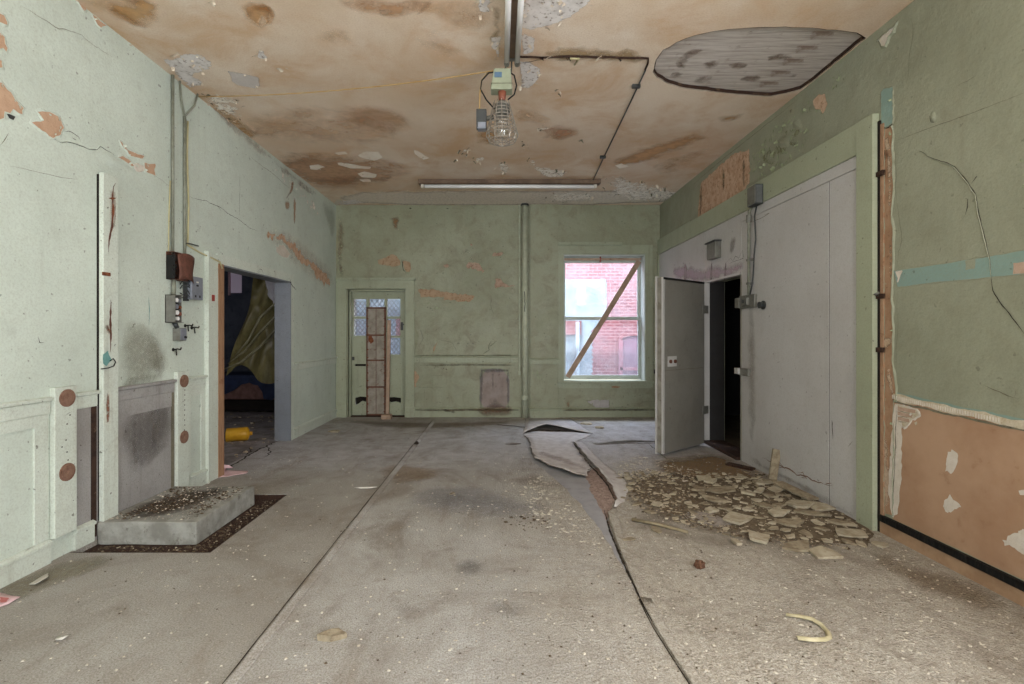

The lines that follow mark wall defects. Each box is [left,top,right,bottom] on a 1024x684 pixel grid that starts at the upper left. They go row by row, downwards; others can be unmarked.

peeling [0,11,65,141]
peeling [164,52,245,122]
peeling [518,0,593,91]
flaking render [775,22,898,96]
crack [54,131,114,155]
water stain [287,156,669,205]
peeling [545,164,677,203]
water stain [620,138,694,164]
peeling [698,149,750,217]
peeling [267,230,330,286]
crack [884,124,1023,332]
flaking render [883,125,921,516]